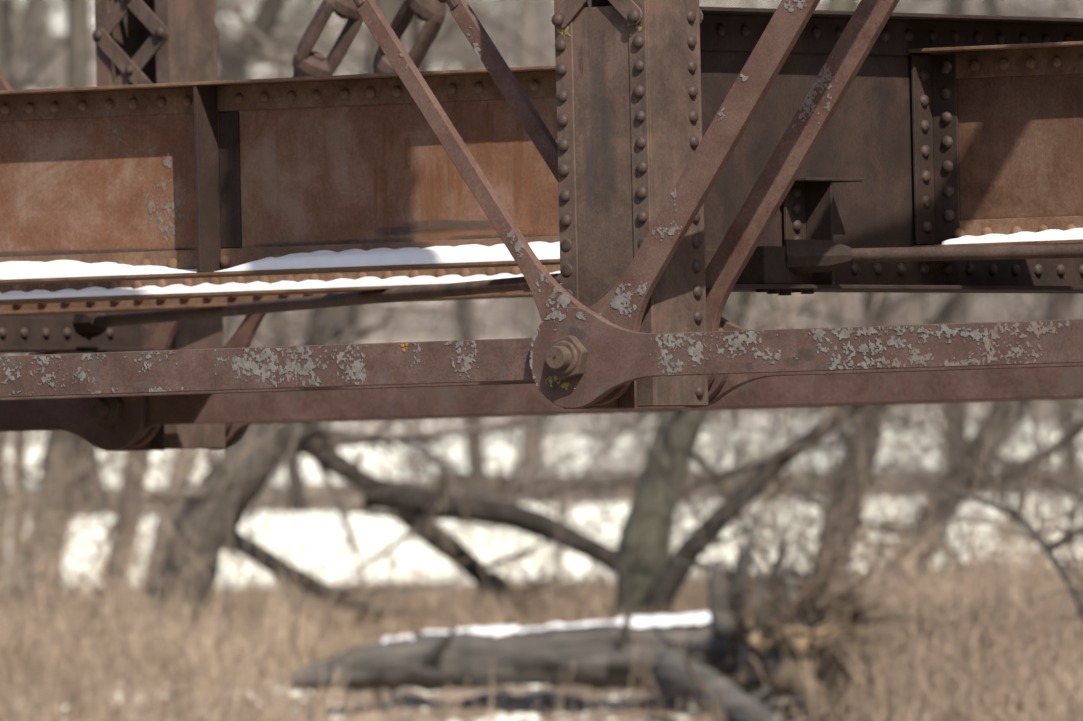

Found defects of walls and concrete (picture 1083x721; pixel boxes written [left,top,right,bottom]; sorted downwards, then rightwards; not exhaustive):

peeling [792,57,837,129]
peeling [138,146,195,243]
peeling [0,353,118,396]
peeling [124,351,177,373]
peeling [215,345,368,388]
peeling [444,341,479,380]
peeling [650,330,798,375]
peeling [809,320,1070,370]